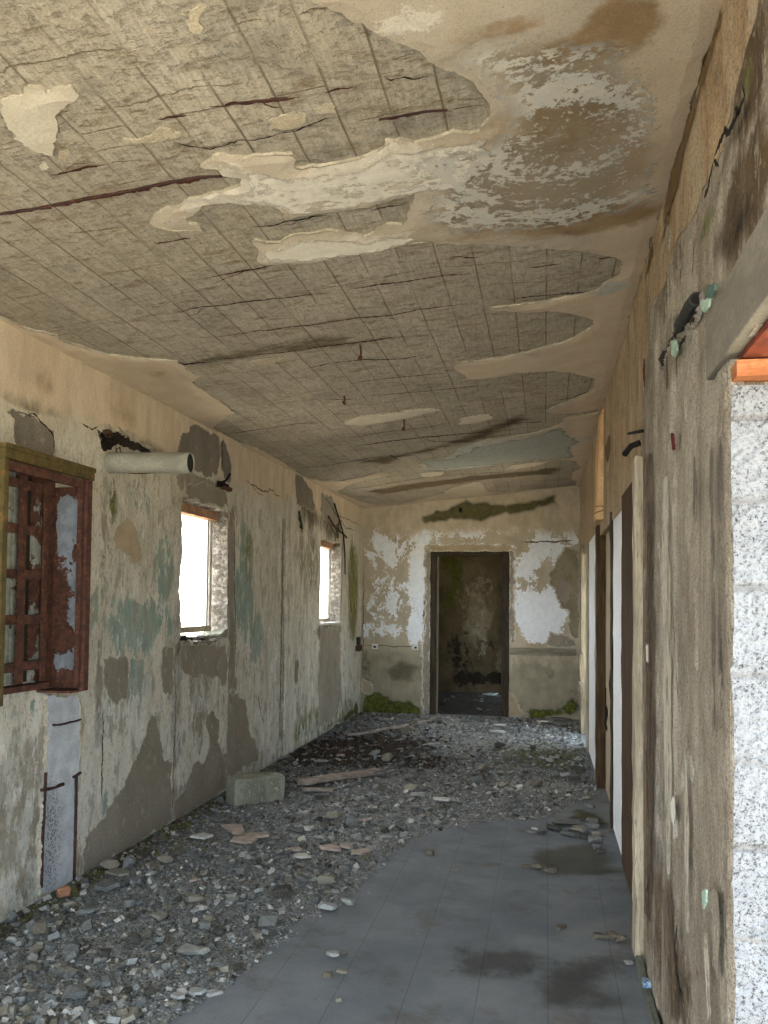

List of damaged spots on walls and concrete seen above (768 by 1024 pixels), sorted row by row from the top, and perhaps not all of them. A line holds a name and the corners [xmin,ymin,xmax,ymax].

crack [54,160,143,175]
crack [9,177,214,215]
crack [158,87,352,150]
crack [386,105,480,120]
crack [704,81,745,198]
spalling [0,0,657,536]
spalling [658,283,717,371]
mould [423,496,555,523]
flaking render [420,542,517,714]
spalling [545,547,581,649]